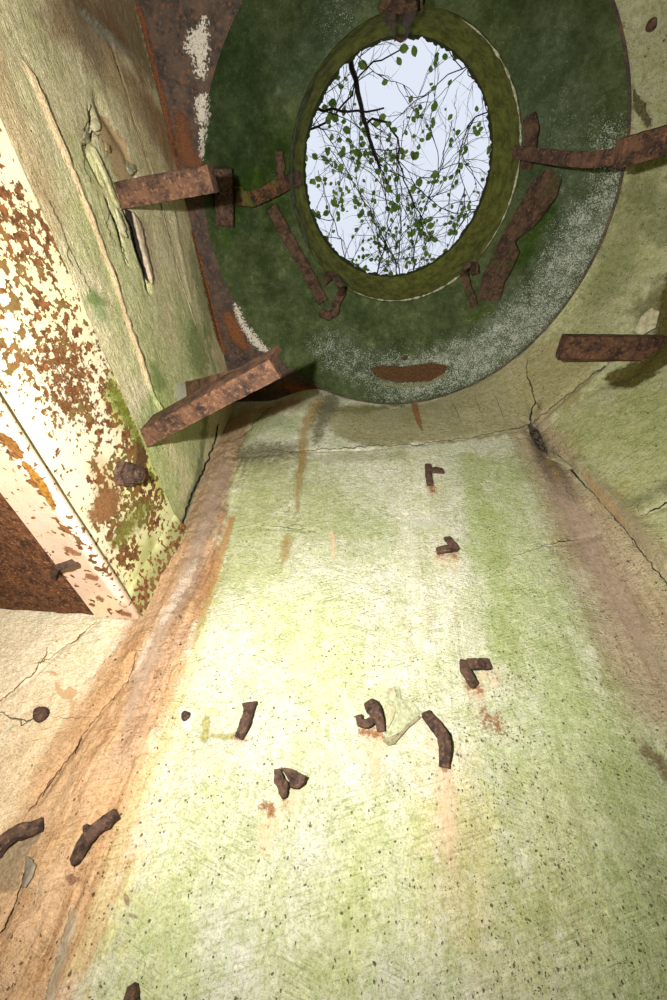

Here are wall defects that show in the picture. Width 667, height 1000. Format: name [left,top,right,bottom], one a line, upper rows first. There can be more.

flaking render [99,116,136,180]
spalling [115,207,153,284]
corrosion [0,433,55,510]
corrosion [87,484,126,527]
corrosion [136,437,147,468]
crack [182,406,272,533]
crack [285,361,667,585]
corrosion [197,517,234,630]
crack [0,621,167,811]